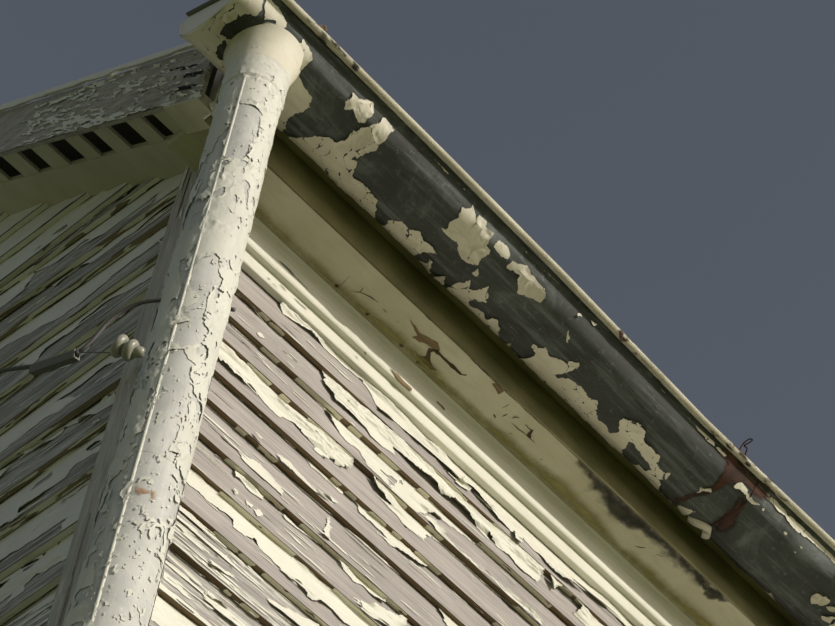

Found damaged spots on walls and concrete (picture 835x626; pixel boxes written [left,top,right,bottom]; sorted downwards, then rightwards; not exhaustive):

peeling [0,59,203,149]
peeling [198,101,265,192]
peeling [0,359,126,495]
peeling [0,238,163,427]
peeling [0,195,173,334]
peeling [136,252,226,465]
peeling [191,270,623,626]
peeling [216,0,726,502]
corrosion [675,443,787,502]
peeling [0,519,66,626]
peeling [71,476,348,626]
peeling [687,482,835,626]